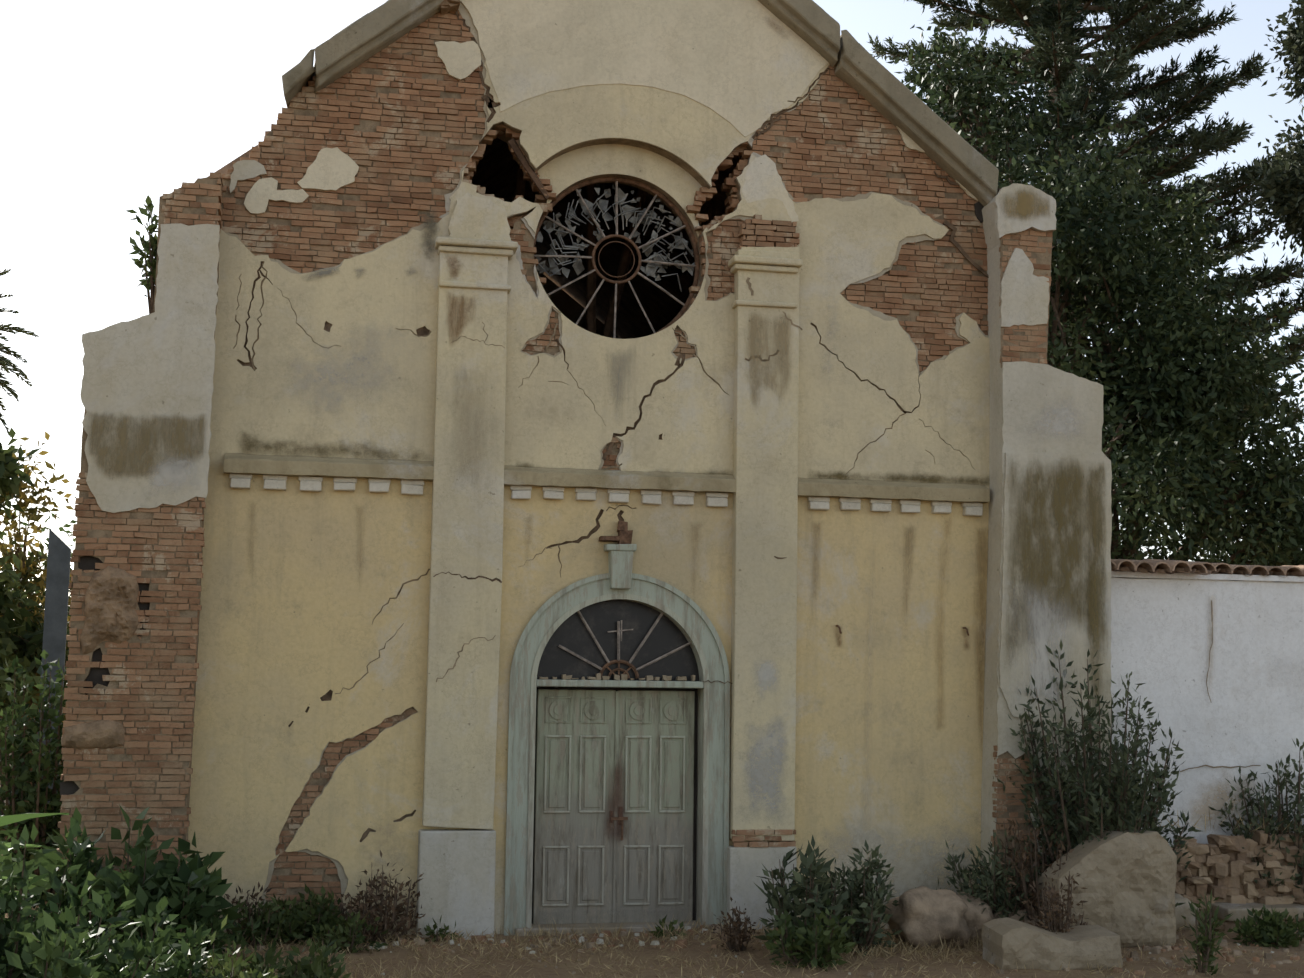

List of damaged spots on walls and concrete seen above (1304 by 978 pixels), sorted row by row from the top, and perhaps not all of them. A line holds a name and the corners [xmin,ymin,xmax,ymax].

flaking render [162,10,556,284]
crack [752,68,830,139]
flaking render [686,64,1053,371]
crack [233,262,338,371]
spalling [522,312,570,355]
crack [518,323,727,470]
damp [750,317,788,397]
crack [745,312,973,474]
flaking render [57,472,206,875]
crack [288,505,636,727]
damp [1032,602,1061,698]
flaking render [265,710,417,926]